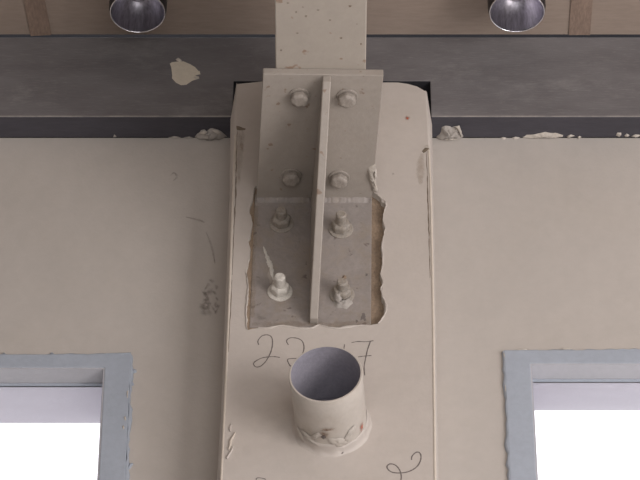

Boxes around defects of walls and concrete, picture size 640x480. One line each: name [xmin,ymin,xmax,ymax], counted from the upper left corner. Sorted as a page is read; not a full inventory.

peeling [170,58,200,85]
peeling [501,132,581,140]
spalling [245,164,388,330]